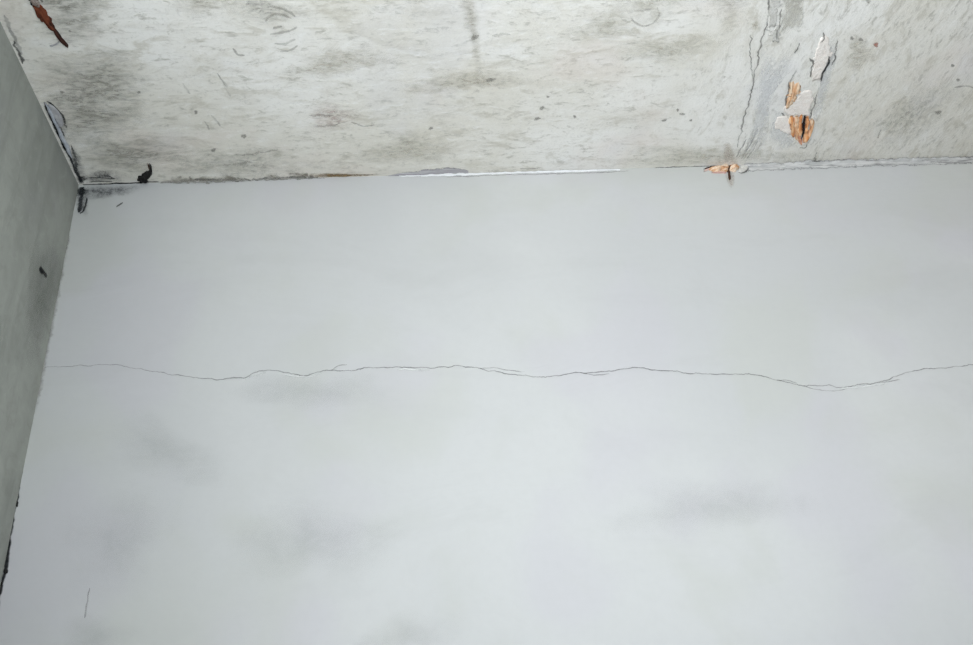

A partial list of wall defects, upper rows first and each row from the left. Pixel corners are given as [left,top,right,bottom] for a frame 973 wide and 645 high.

crack [737,0,782,159]
spalling [773,33,838,148]